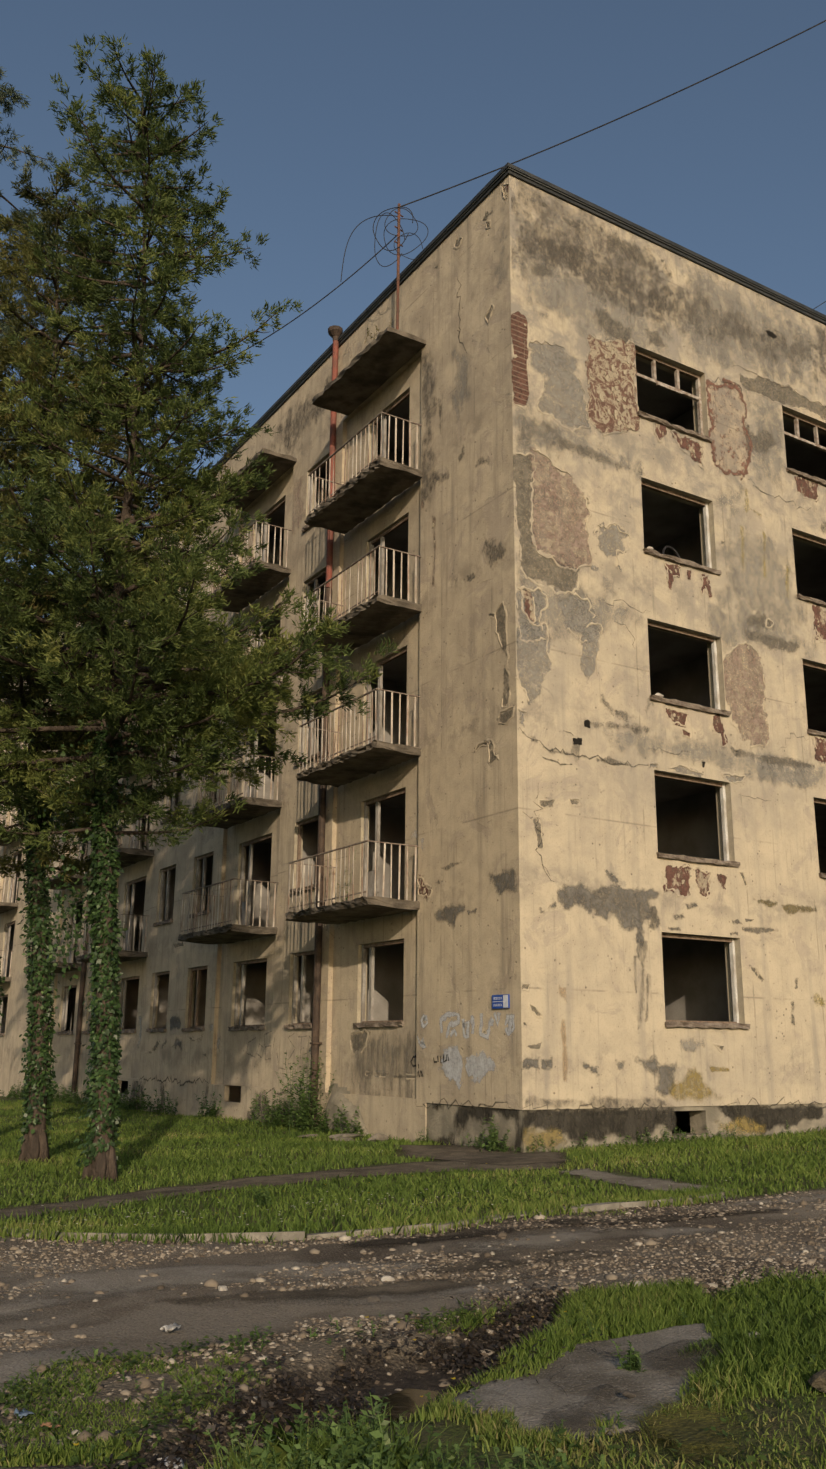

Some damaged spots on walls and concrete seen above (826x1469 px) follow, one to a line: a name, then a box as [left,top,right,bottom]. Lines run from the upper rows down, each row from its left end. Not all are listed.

peeling [484,303,826,481]
peeling [792,475,819,502]
peeling [663,559,712,598]
peeling [474,447,632,763]
peeling [812,605,826,643]
peeling [711,641,771,749]
peeling [665,707,690,738]
spalling [648,761,750,785]
peeling [661,864,748,899]
water stain [541,870,697,988]
water stain [427,1058,676,1152]
water stain [719,1104,823,1134]